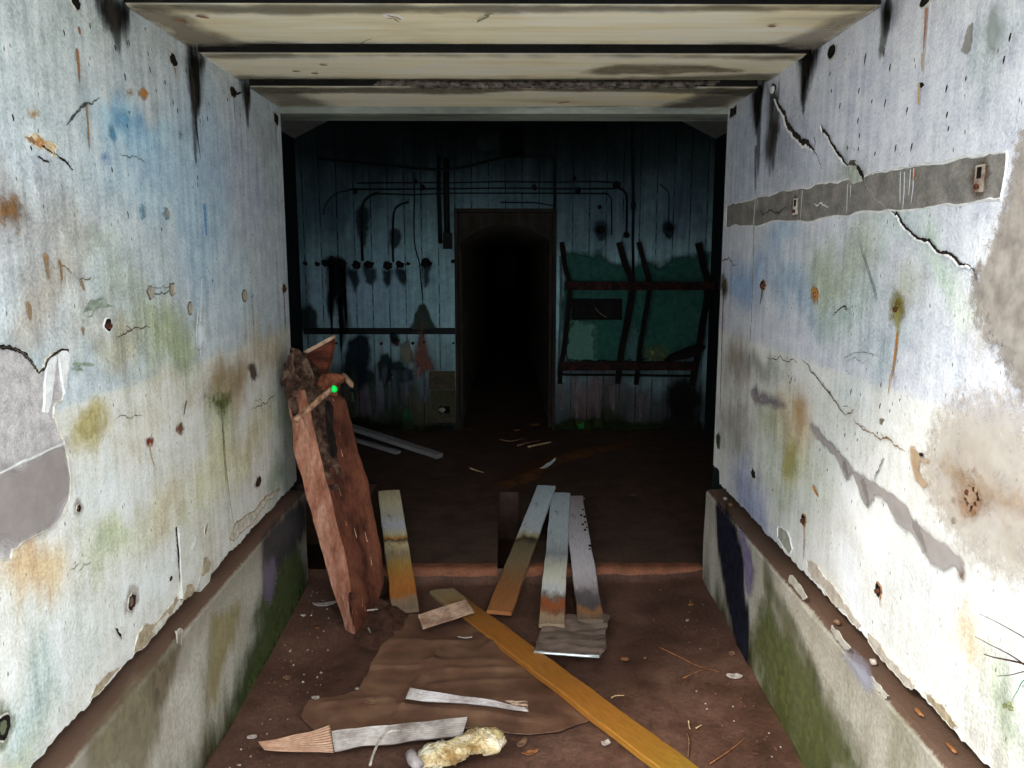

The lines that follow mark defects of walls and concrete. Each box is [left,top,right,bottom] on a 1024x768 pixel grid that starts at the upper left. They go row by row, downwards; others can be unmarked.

rust [917,8,927,104]
crack [66,98,100,125]
crack [773,98,865,184]
crack [858,240,876,300]
peeling [726,130,1024,404]
crack [890,211,977,280]
rust [888,292,904,393]
flaking render [0,344,71,562]
crack [767,356,903,480]
flaking render [89,666,121,701]
flaking render [133,594,183,654]
flaking render [788,559,958,730]